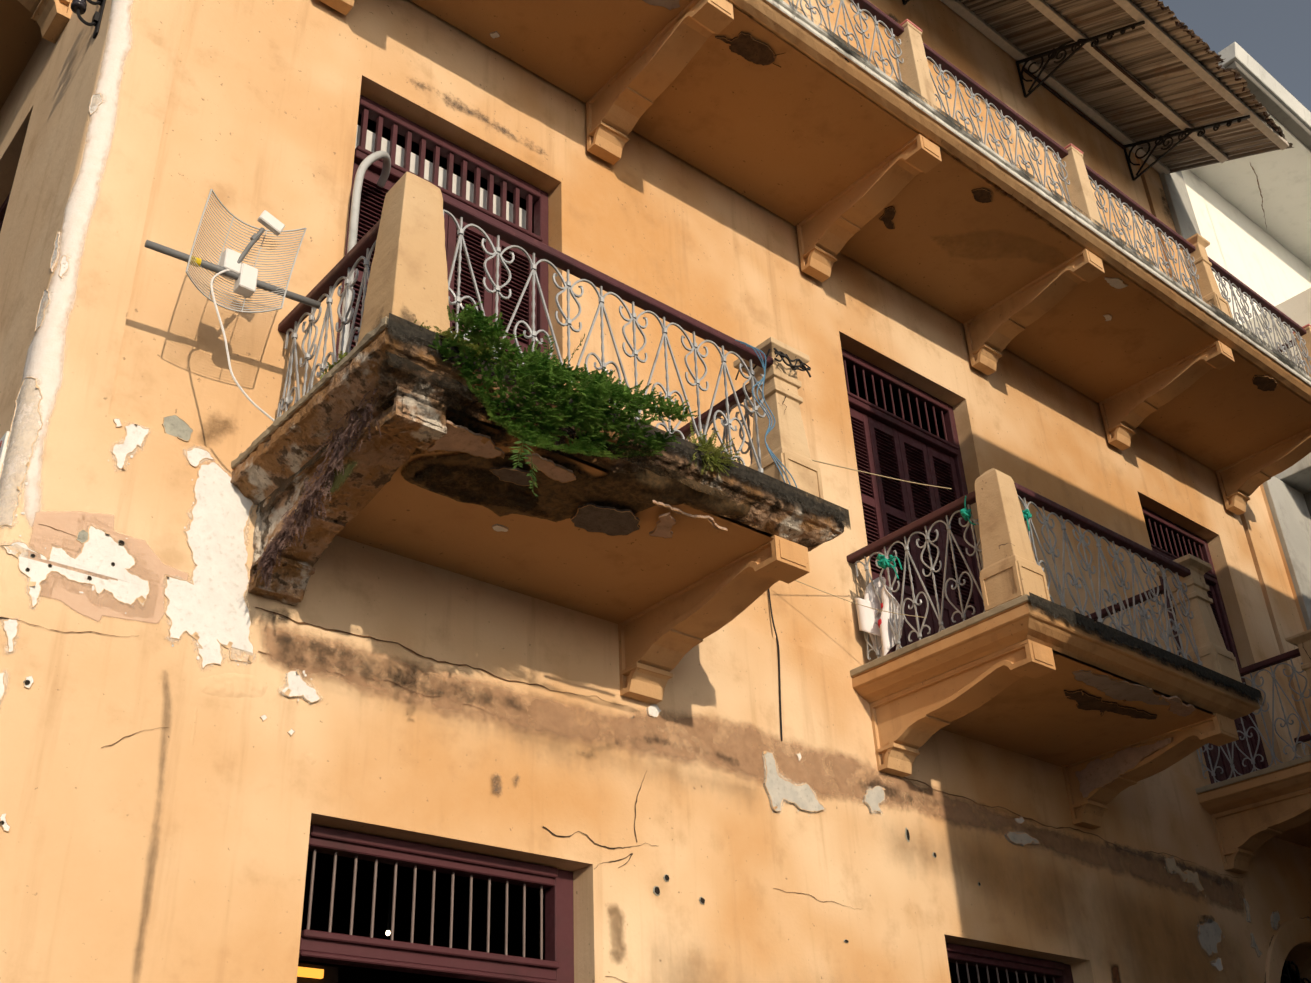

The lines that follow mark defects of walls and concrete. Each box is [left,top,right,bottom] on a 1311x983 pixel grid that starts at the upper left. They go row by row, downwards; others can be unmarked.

spalling [715,31,775,66]
peeling [0,0,255,669]
peeling [427,420,576,486]
peeling [0,671,8,700]
damp [278,636,348,668]
crack [255,607,626,706]
spalling [1064,670,1196,720]
damp [1029,592,1263,704]
crack [543,771,656,869]
peeling [762,751,825,816]
peeling [862,786,886,813]
peeling [1197,918,1225,971]